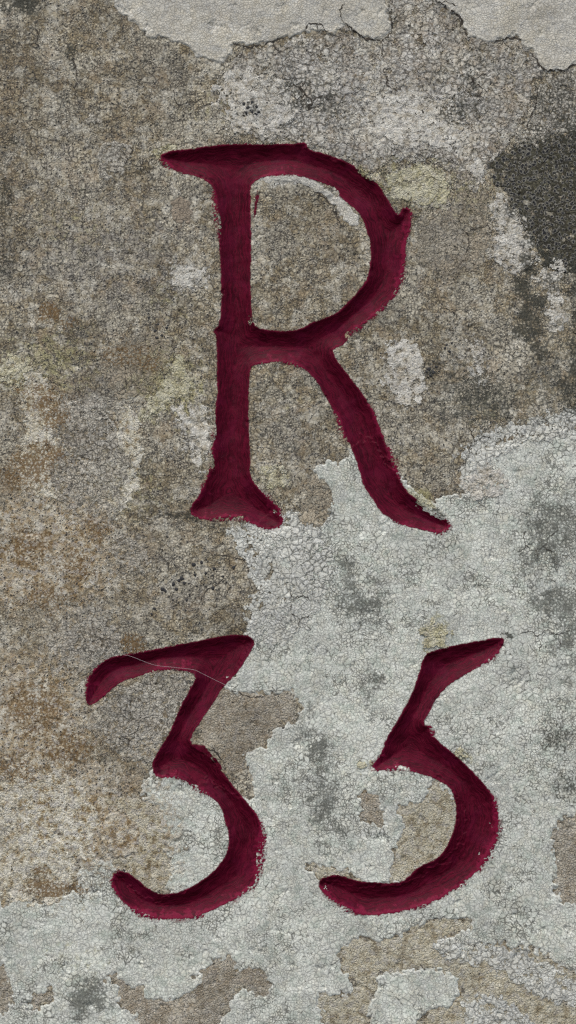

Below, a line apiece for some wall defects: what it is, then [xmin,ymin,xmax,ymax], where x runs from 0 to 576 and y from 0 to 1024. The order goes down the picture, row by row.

water stain [487,67,576,360]
water stain [557,311,576,413]
crack [465,422,492,467]
crack [519,530,558,559]
crack [200,551,251,602]
crack [288,589,309,629]